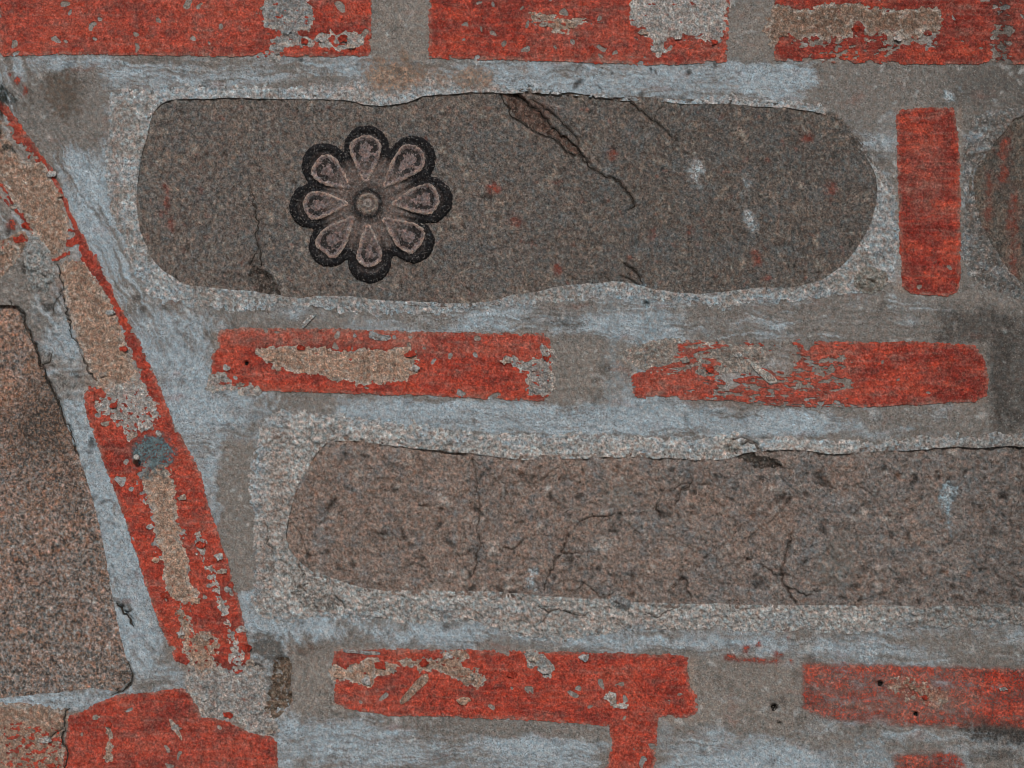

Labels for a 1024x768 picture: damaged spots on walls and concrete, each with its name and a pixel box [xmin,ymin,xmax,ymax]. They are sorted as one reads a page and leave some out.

peeling [629,0,731,58]
peeling [762,2,944,48]
crack [499,82,635,209]
crack [630,102,672,138]
peeling [255,331,420,387]
peeling [500,343,557,397]
crack [736,437,786,469]
crack [460,461,482,577]
peeling [142,464,293,740]
crack [538,535,587,622]
crack [758,536,825,603]
peeling [328,649,487,705]